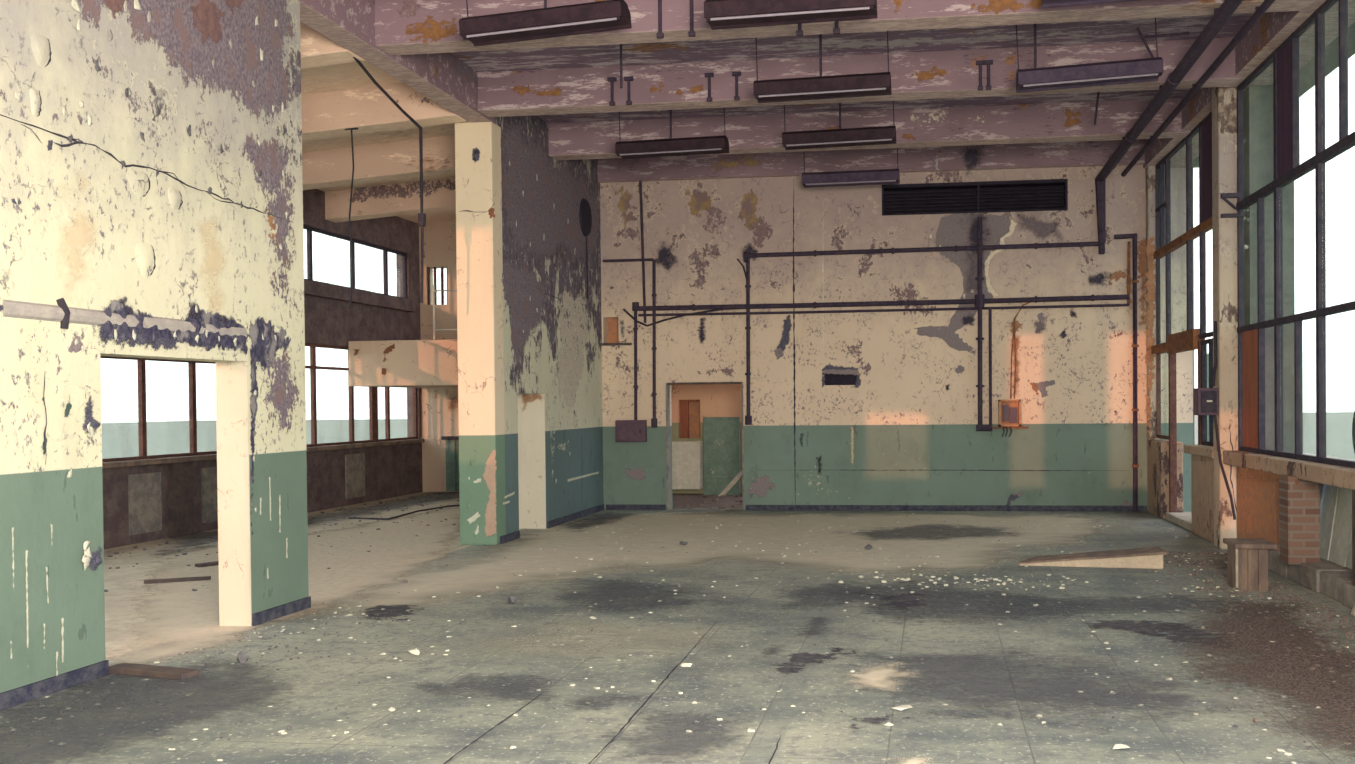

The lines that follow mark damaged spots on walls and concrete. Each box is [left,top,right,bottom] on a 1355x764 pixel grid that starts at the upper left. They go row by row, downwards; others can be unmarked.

peeling [397,1,458,46]
peeling [911,66,947,81]
peeling [795,31,1097,53]
peeling [971,0,1042,15]
crack [0,114,294,223]
peeling [0,0,303,317]
peeling [488,121,637,483]
peeling [888,213,1017,390]
peeling [1034,311,1077,338]
peeling [22,376,47,465]
spalling [64,297,299,535]
peeling [467,450,515,537]